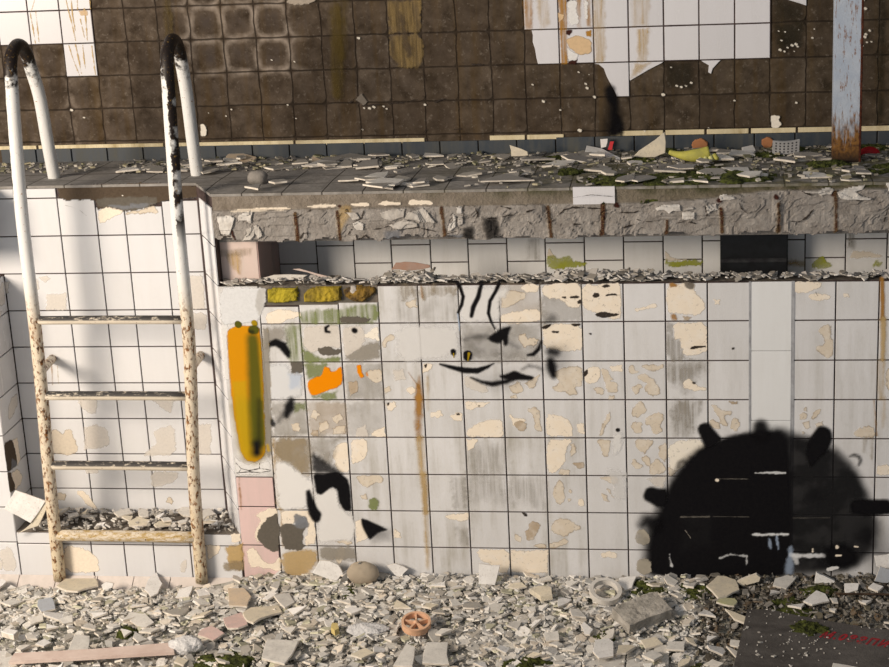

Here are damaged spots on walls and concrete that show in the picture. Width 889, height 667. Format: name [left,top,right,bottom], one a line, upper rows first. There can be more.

rust [66,1,96,75]
spalling [58,182,169,212]
flaking render [216,207,291,241]
flaking render [348,199,435,231]
flaking render [656,204,695,220]
flaking render [805,185,872,200]
peeling [501,283,559,333]
peeling [795,281,830,301]
peeling [583,364,704,476]
spalling [4,440,17,492]
rust [415,382,427,514]
peeling [430,401,585,506]